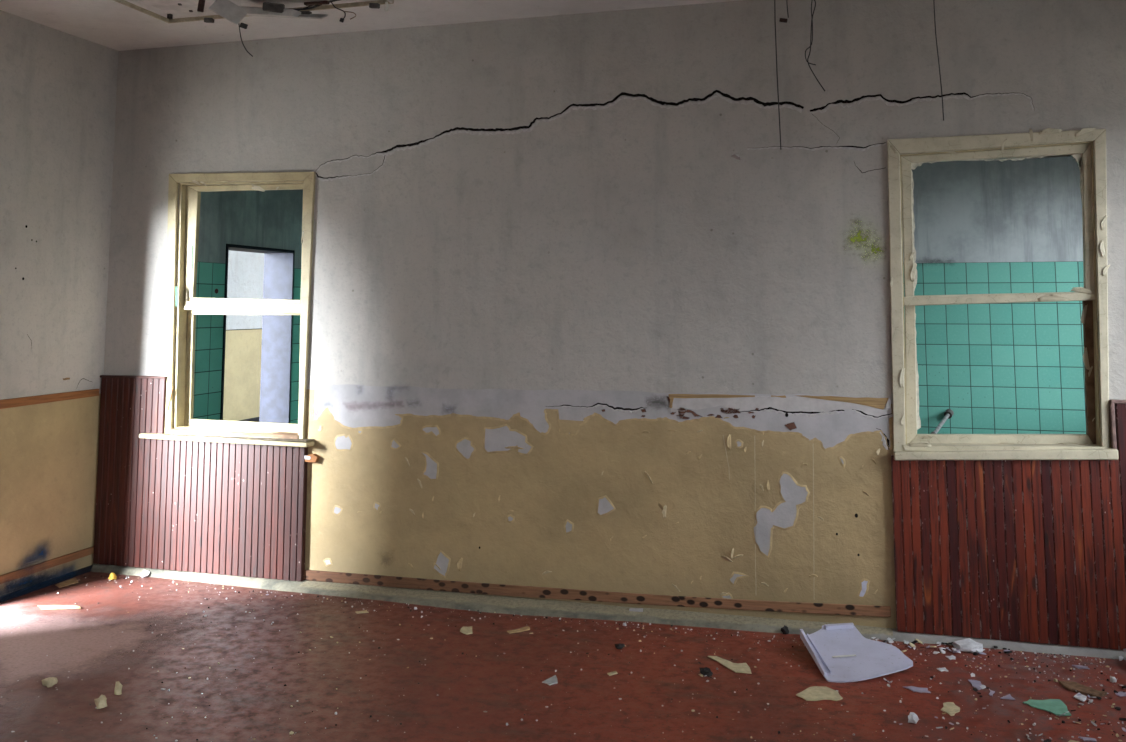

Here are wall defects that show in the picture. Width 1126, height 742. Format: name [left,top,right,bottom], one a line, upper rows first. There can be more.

crack [315,90,1034,181]
crack [546,403,646,414]
peeling [312,384,893,469]
peeling [417,452,439,488]
peeling [596,495,616,517]
peeling [752,471,810,558]
peeling [433,550,463,578]